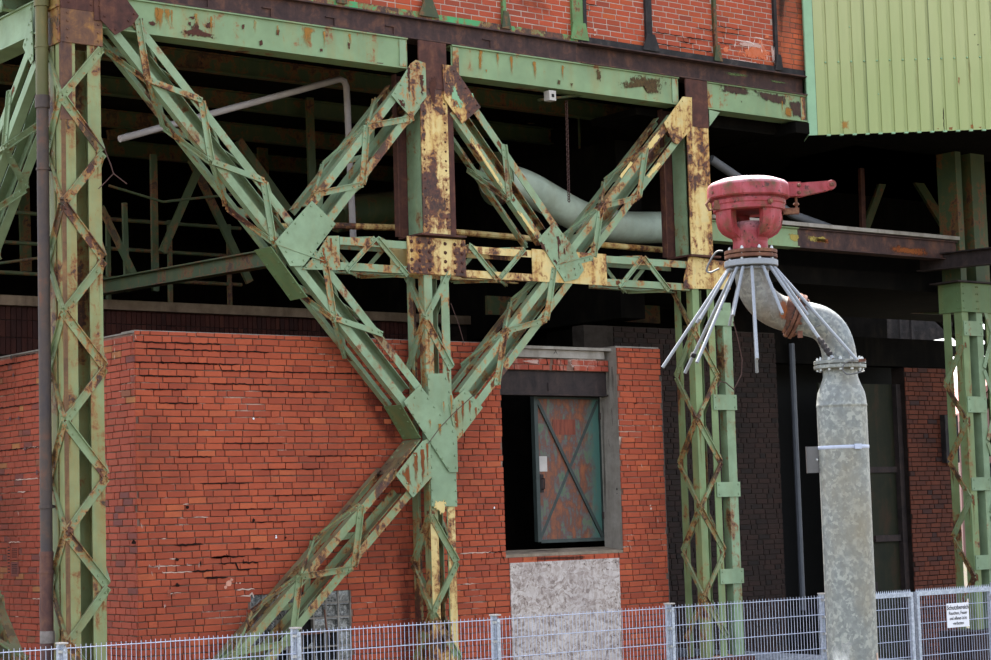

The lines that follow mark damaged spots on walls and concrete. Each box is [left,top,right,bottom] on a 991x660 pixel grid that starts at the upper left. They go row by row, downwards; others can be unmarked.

rust [398,62,437,108]
crack [177,442,283,458]
crack [202,455,365,484]
crack [228,494,323,523]
crack [176,543,263,579]